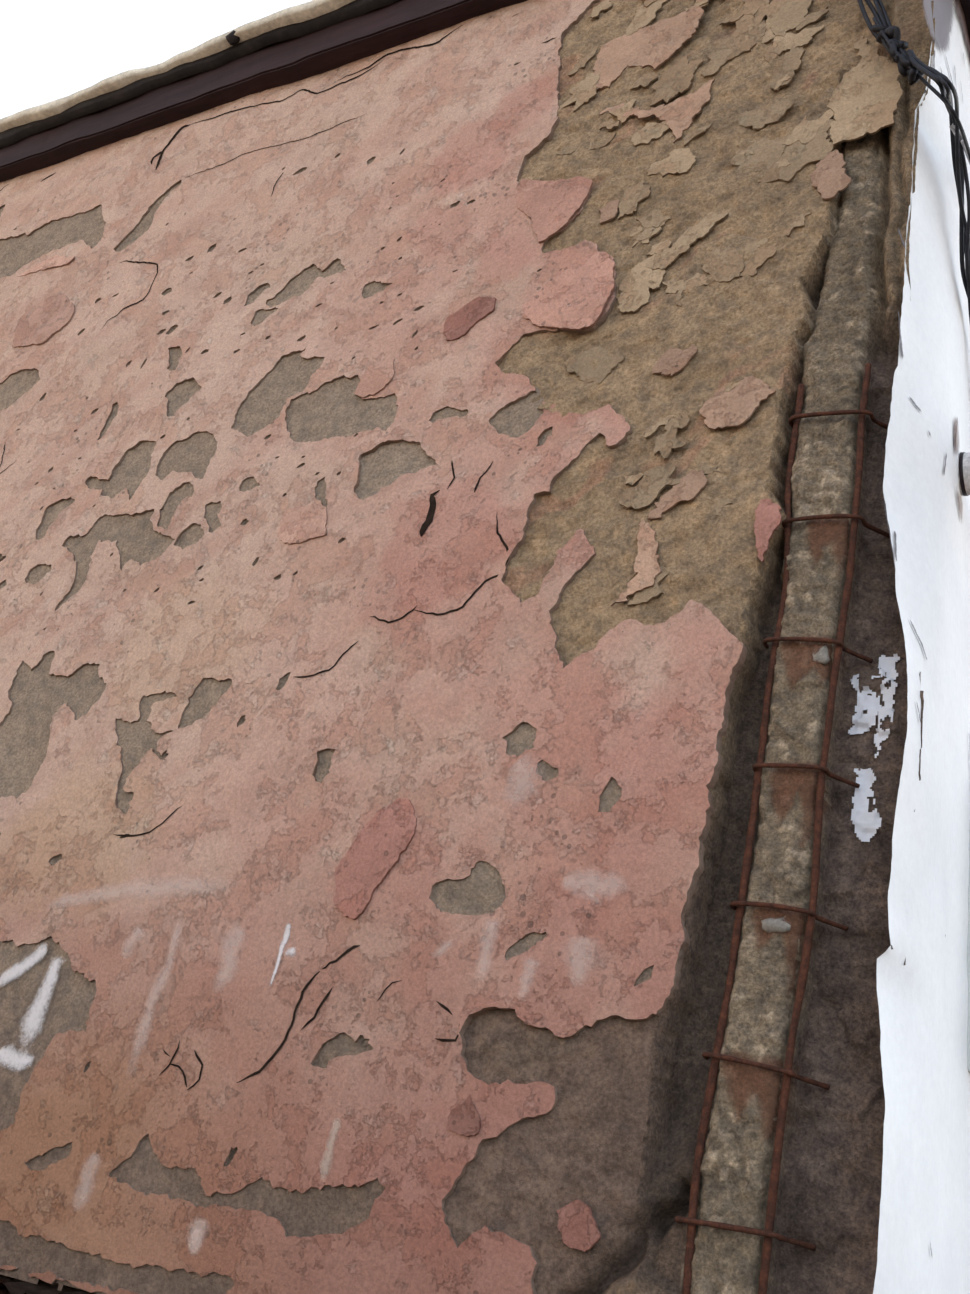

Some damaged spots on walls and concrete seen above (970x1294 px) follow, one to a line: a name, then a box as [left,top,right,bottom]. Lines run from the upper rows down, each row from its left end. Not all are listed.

crack [150,25,462,196]
spalling [490,0,935,666]
corrosion [783,641,833,682]
peeling [851,654,900,842]
water stain [0,1048,32,1070]
water stain [0,945,46,985]
peeling [0,938,97,1131]
crack [159,1040,203,1090]
crack [237,945,360,1083]
corrosion [756,907,806,981]
spalling [445,1009,663,1294]
crack [0,1276,95,1294]